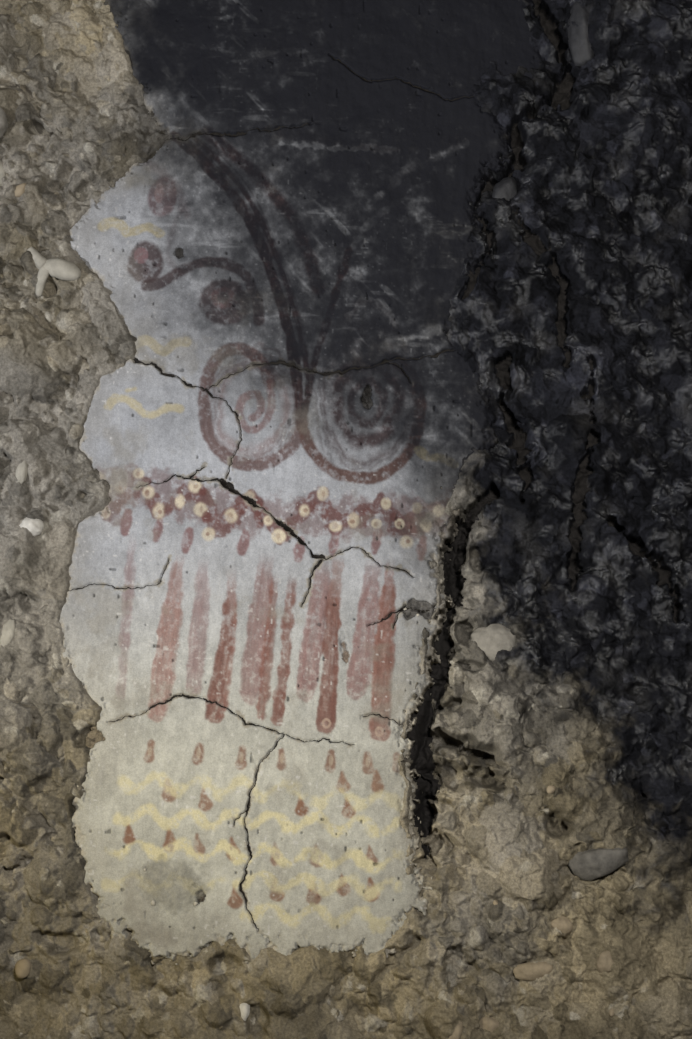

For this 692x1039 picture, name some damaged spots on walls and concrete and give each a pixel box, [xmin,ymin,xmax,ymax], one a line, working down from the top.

spalling [361,385,373,409]
crack [133,349,455,605]
crack [68,560,169,591]
crack [368,604,437,629]
spalling [403,598,436,620]
spalling [85,726,105,748]
crack [108,694,355,931]